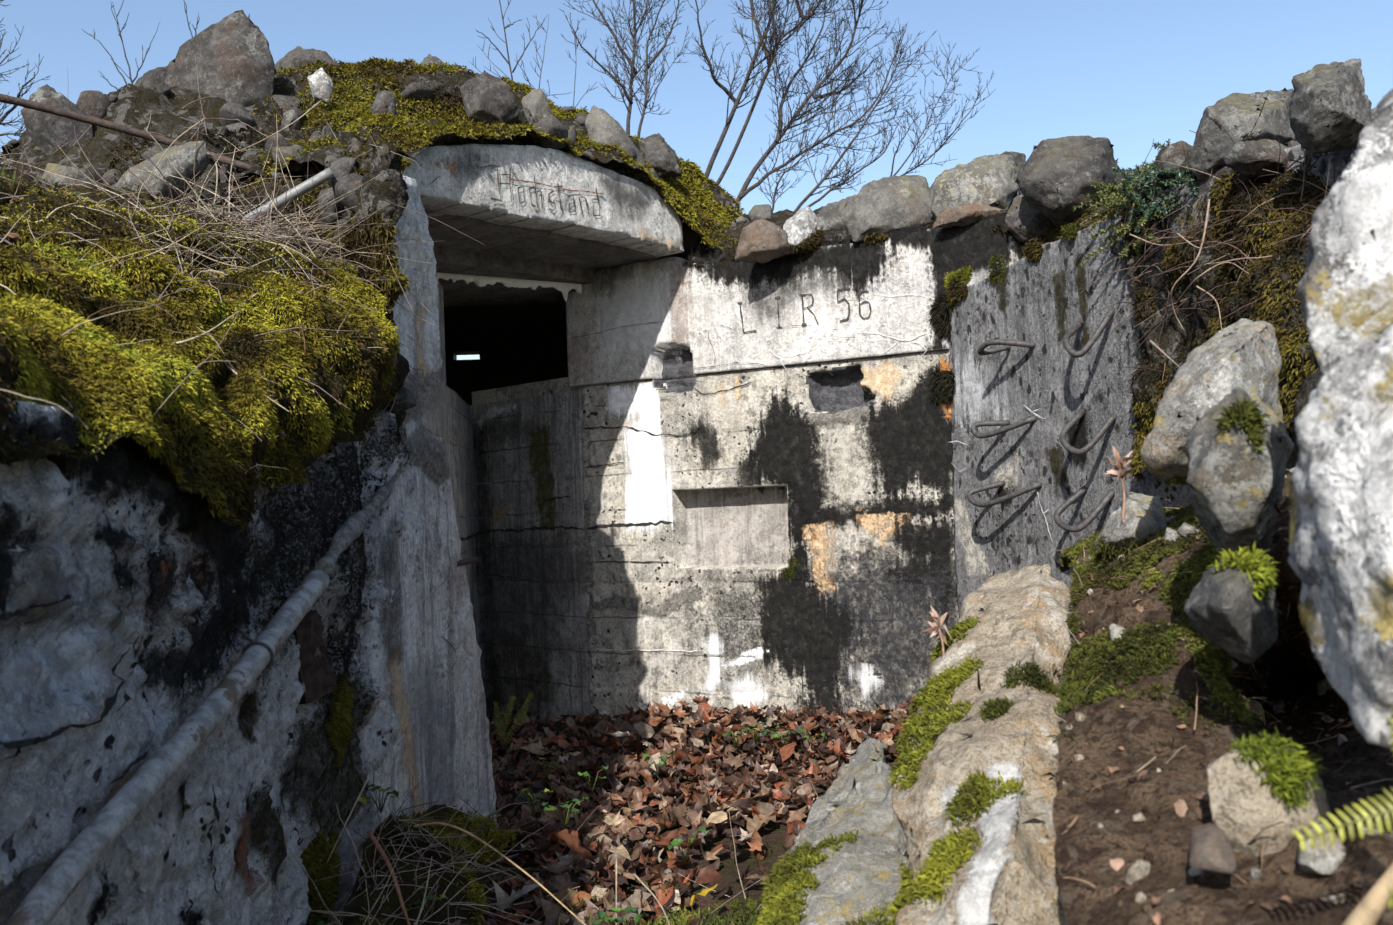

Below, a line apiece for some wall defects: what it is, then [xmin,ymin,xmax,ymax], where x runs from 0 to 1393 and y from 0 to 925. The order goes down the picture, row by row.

damp [893,366,922,394]
crack [434,324,928,563]
damp [861,667,877,694]